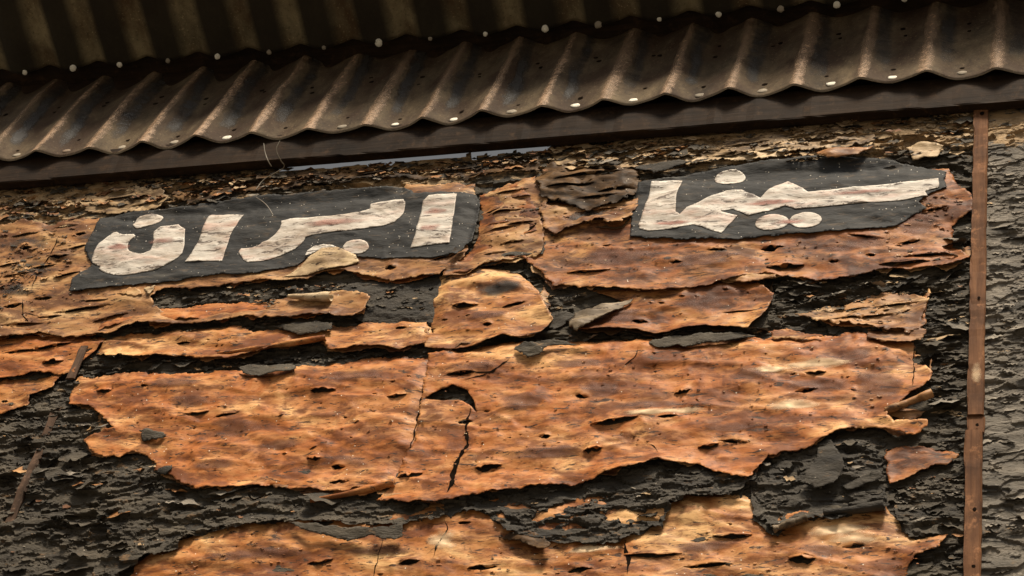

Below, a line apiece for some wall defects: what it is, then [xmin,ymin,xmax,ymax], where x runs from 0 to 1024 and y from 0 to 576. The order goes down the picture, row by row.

peeling [0,113,974,220]
peeling [985,158,1024,413]
crack [410,388,423,448]
crack [447,408,471,492]
peeling [0,218,972,576]
spalling [983,434,1024,485]
peeling [982,495,1024,556]